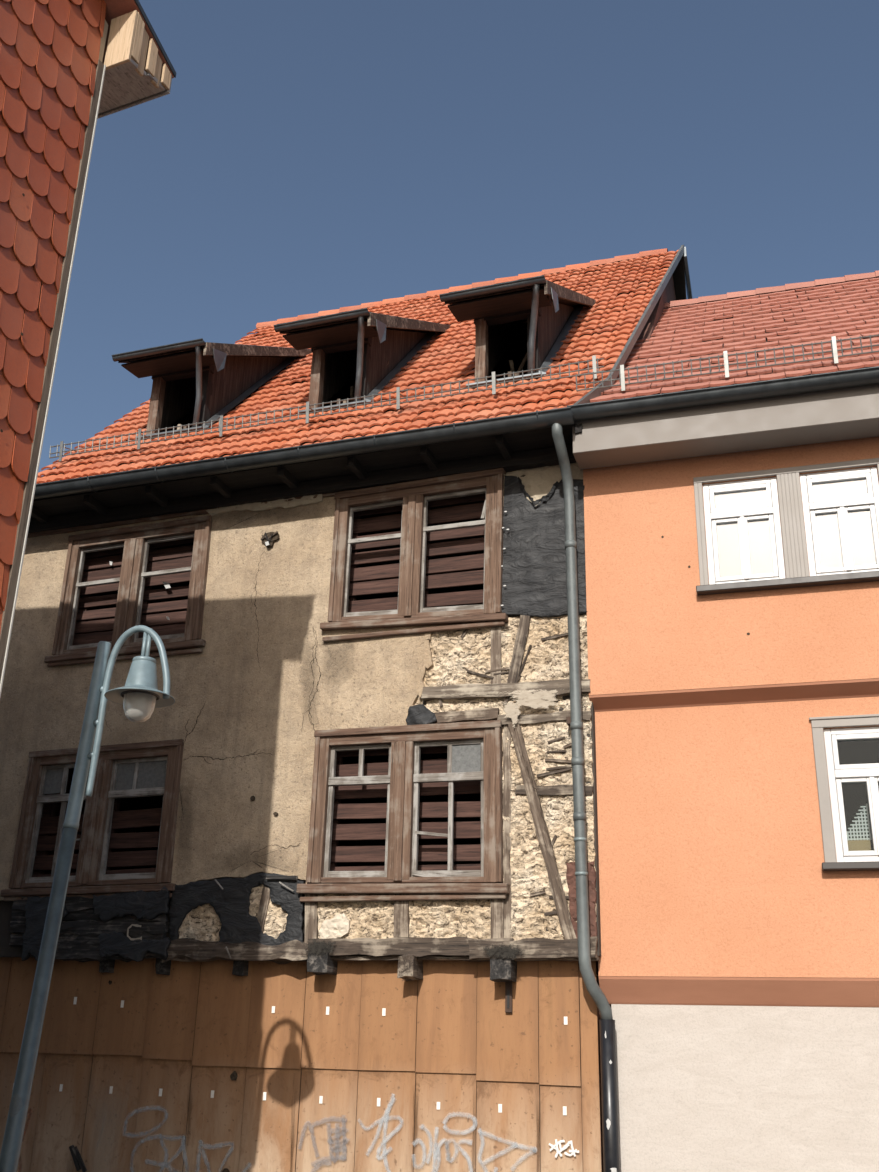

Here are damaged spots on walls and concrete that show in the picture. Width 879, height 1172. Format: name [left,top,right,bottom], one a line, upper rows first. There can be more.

spalling [506,462,583,505]
crack [302,628,321,731]
crack [185,704,272,764]
spalling [406,613,598,941]
spalling [178,904,222,942]
spalling [249,884,288,939]
spalling [317,894,394,939]